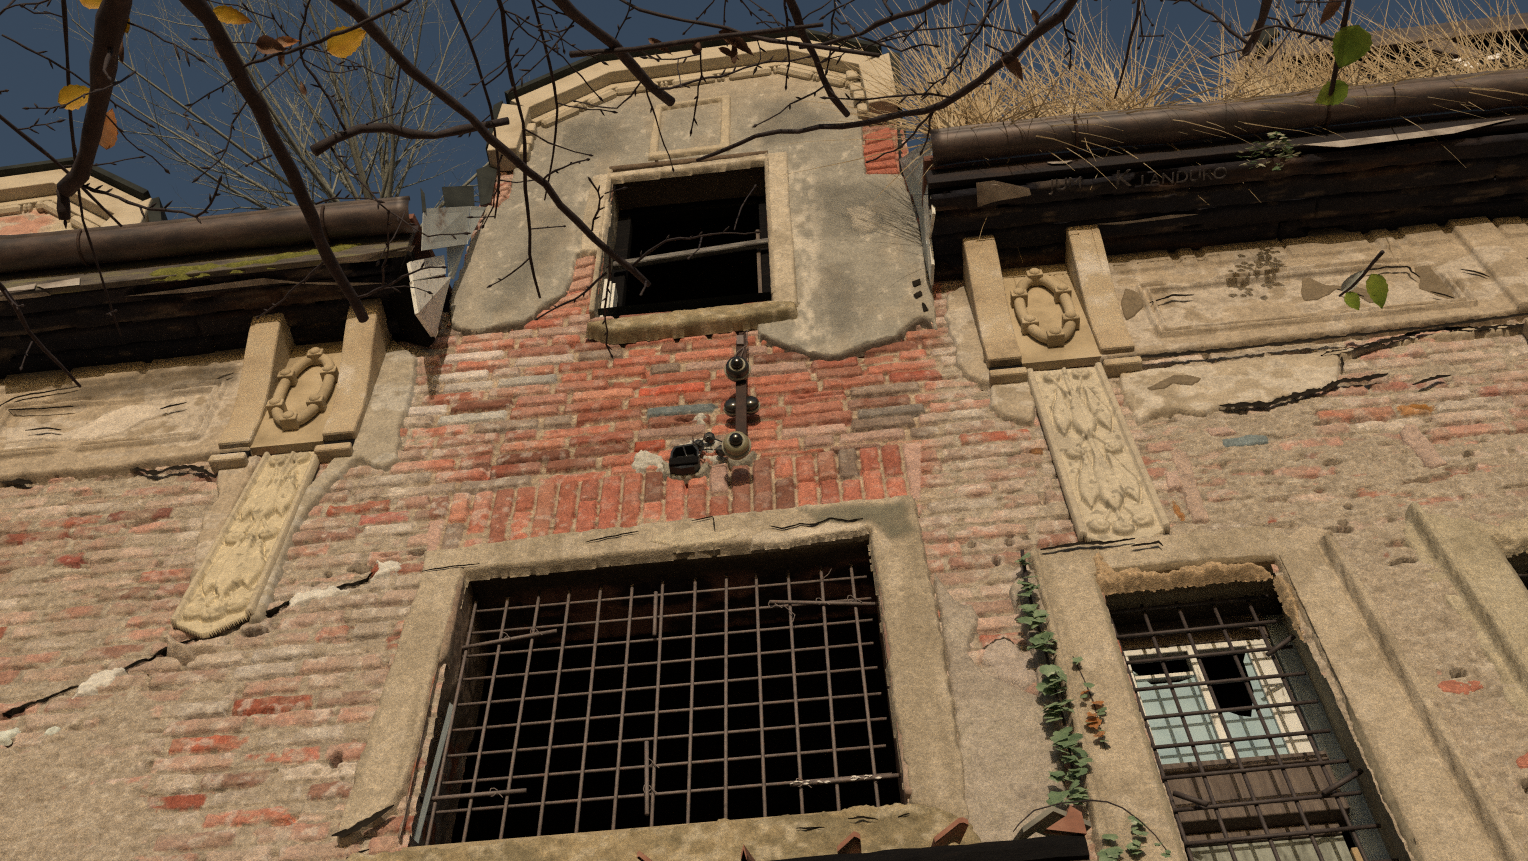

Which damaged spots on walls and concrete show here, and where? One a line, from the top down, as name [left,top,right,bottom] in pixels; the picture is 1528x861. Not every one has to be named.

flaking render [863,128,899,175]
crack [1140,266,1528,408]
peeling [1147,375,1201,391]
crack [586,531,638,542]
crack [769,517,863,529]
crack [265,560,480,618]
spalling [1092,552,1304,641]
crack [2,638,197,719]